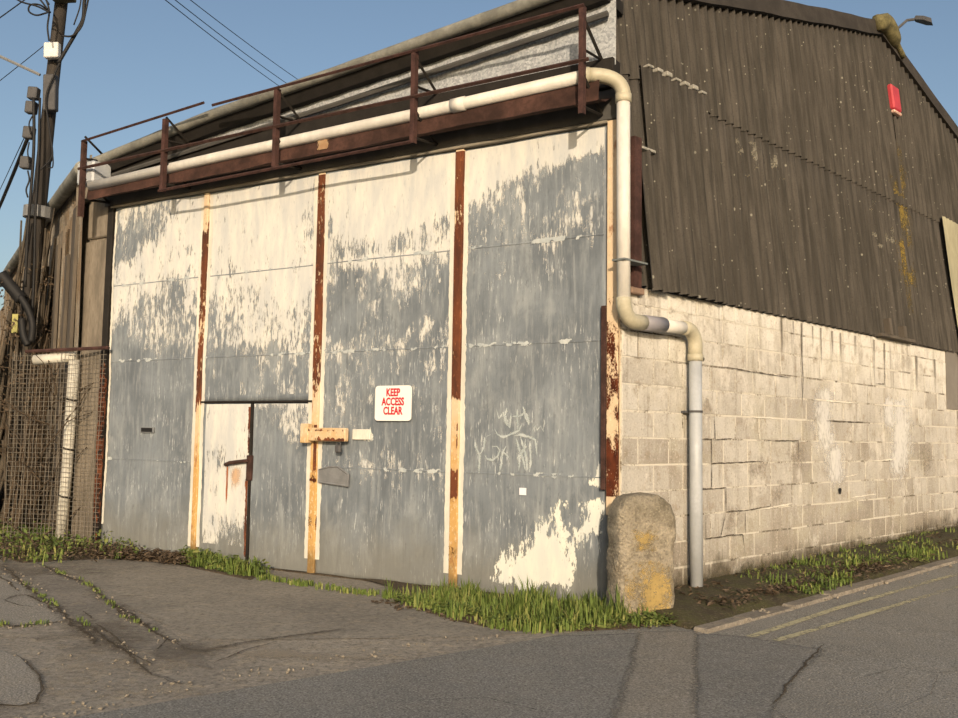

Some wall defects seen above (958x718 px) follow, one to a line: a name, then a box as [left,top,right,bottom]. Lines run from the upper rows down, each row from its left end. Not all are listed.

peeling [468,127,605,244]
corrosion [195,222,209,412]
peeling [112,176,315,547]
corrosion [312,174,326,397]
peeling [323,153,452,428]
corrosion [451,151,465,400]
corrosion [606,321,619,497]
water stain [813,388,843,483]
water stain [884,398,913,476]
peeling [490,464,605,594]
crack [0,654,44,706]
crack [0,563,344,684]